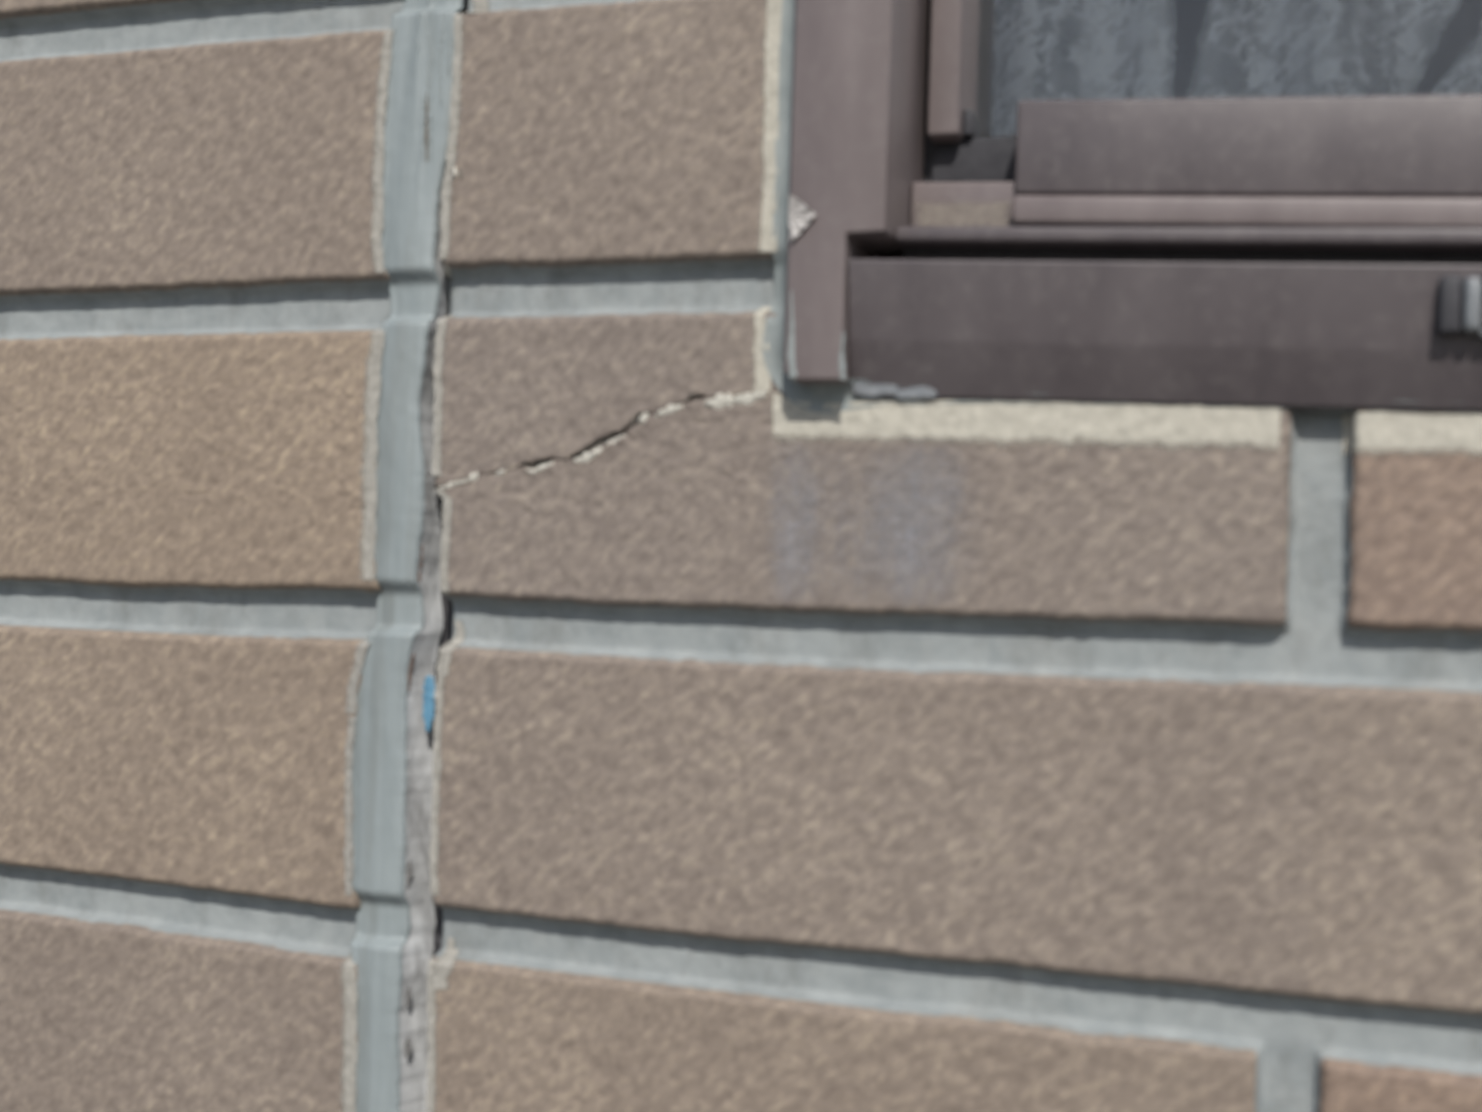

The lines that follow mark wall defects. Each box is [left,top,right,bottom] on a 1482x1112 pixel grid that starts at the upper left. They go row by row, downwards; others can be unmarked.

crack [432,389,773,491]